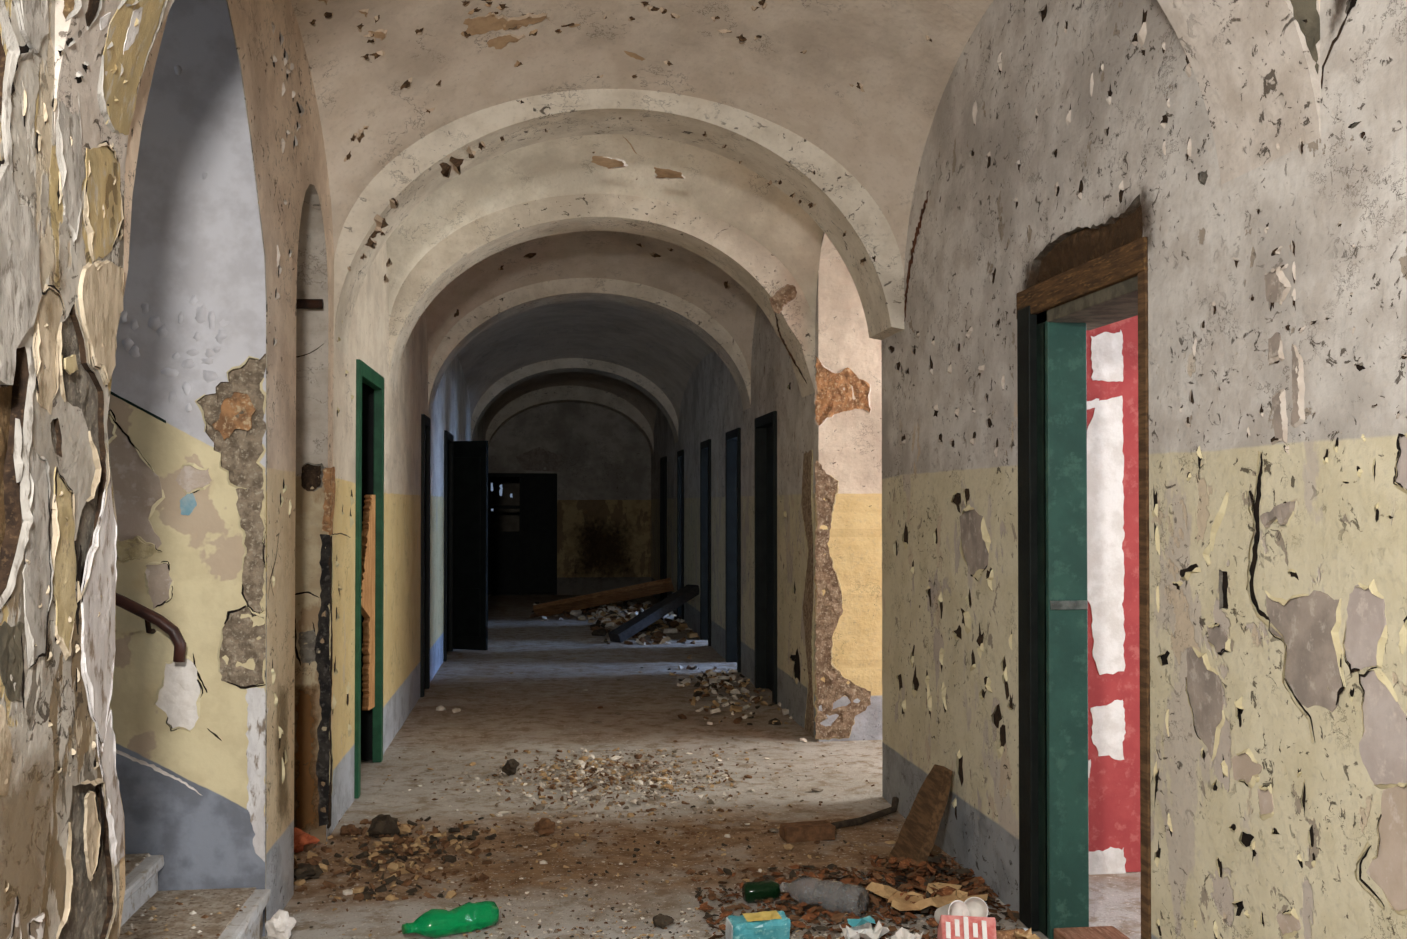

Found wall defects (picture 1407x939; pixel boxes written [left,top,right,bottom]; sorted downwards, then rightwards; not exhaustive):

peeling [461,0,581,50]
flaking render [439,136,505,178]
flaking render [784,449,871,740]
peeling [893,489,1013,758]
peeling [1087,330,1125,675]
peeling [1088,700,1126,778]
peeling [1089,847,1126,875]
peeling [1157,571,1279,834]
peeling [1229,824,1257,862]
crack [1203,451,1315,743]
peeling [1265,569,1407,916]
peeling [1393,411,1407,489]